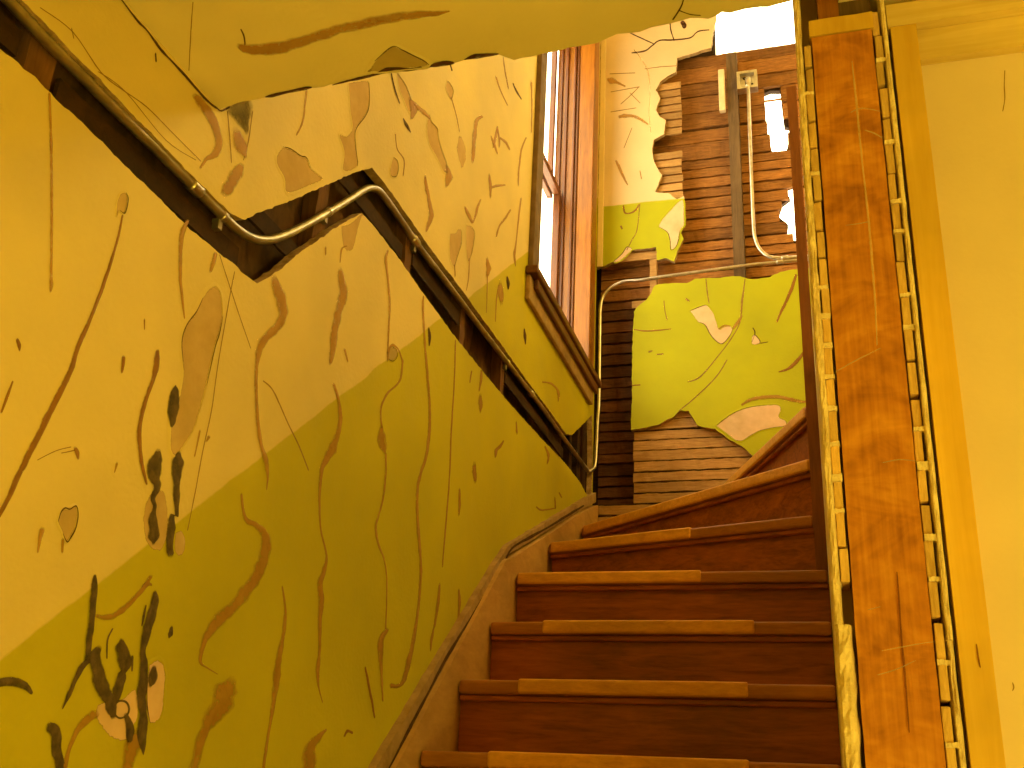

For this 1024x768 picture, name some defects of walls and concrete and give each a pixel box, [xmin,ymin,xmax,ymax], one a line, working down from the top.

spalling [49,60,284,280]
damp [137,350,210,556]
peeling [167,282,225,460]
spalling [264,43,499,250]
spalling [410,249,451,328]
spalling [463,312,492,381]
spalling [503,367,561,458]
crack [610,0,709,147]
peeling [657,199,686,251]
peeling [715,403,788,443]
damp [47,575,159,768]
peeling [96,655,168,740]